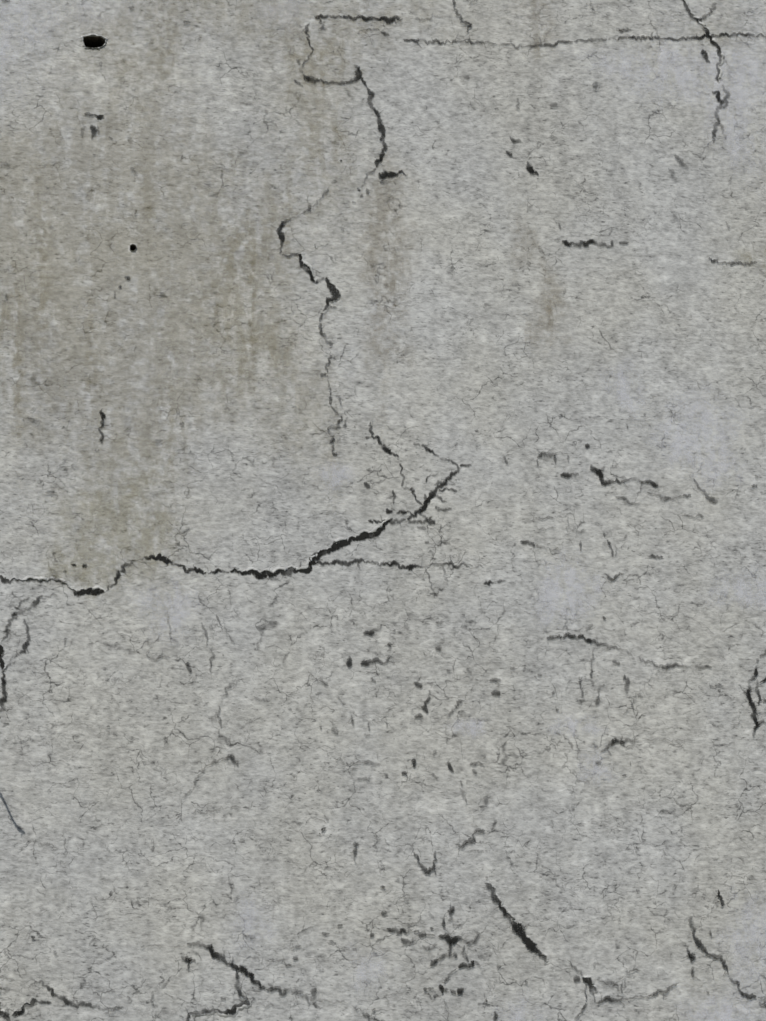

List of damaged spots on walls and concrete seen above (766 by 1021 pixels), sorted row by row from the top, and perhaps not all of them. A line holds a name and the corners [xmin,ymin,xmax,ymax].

crack [294,0,589,183]
crack [618,0,765,136]
crack [276,209,341,336]
crack [562,239,628,248]
crack [537,443,715,503]
crack [0,425,471,604]
crack [0,628,30,704]
crack [746,654,766,730]
crack [485,881,549,962]
crack [0,979,93,1021]
crack [186,943,317,1021]
crack [686,928,759,999]